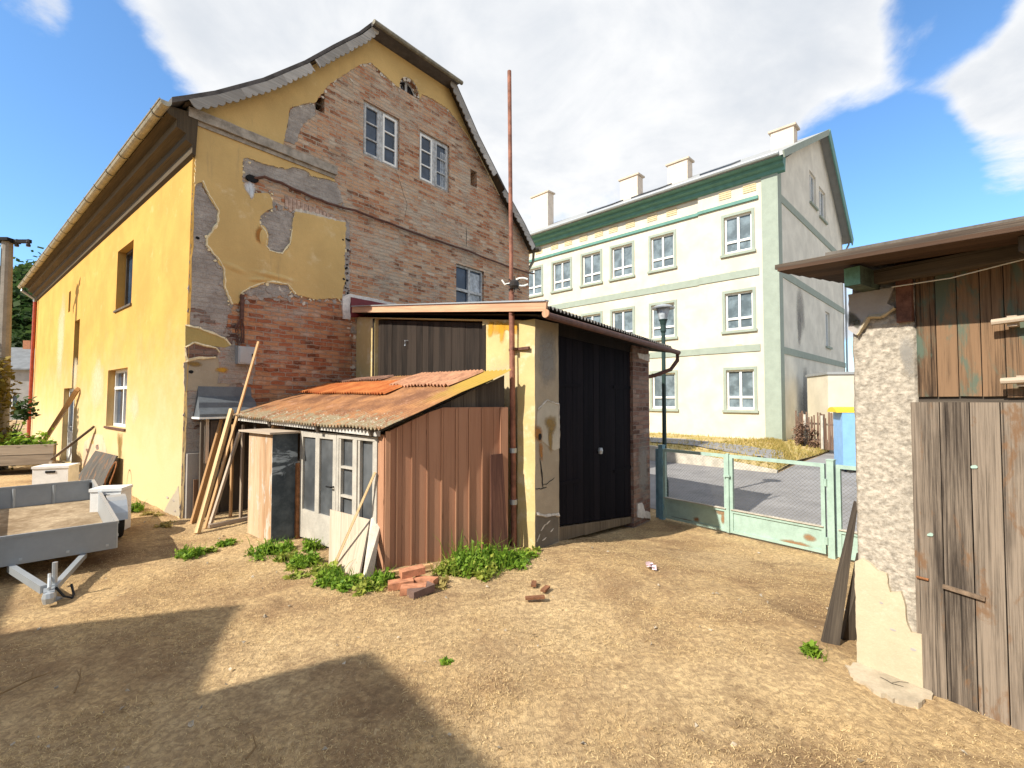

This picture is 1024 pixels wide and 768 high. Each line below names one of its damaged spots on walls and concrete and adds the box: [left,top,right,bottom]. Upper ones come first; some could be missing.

flaking render [164,64,528,518]
flaking render [848,287,896,336]
flaking render [537,400,560,451]